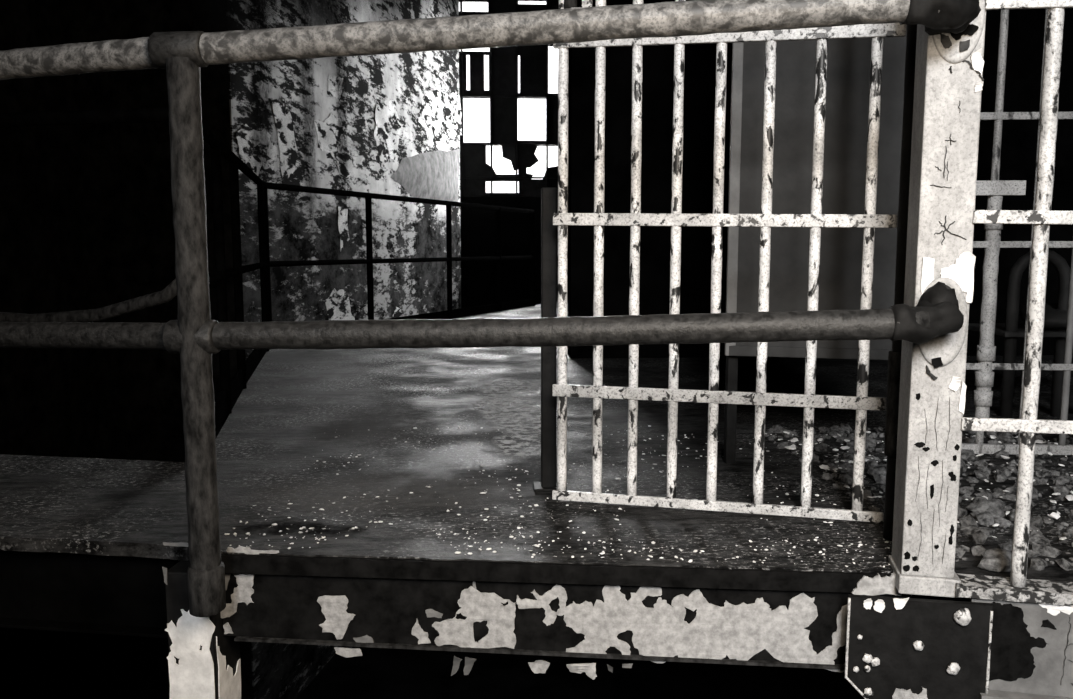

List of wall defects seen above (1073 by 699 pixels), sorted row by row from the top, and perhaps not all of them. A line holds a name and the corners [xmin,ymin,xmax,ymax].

peeling [914,442,939,466]
peeling [226,546,279,555]
peeling [165,573,255,699]
peeling [317,595,374,658]
peeling [411,551,919,680]
peeling [989,601,1073,682]
peeling [892,687,928,699]